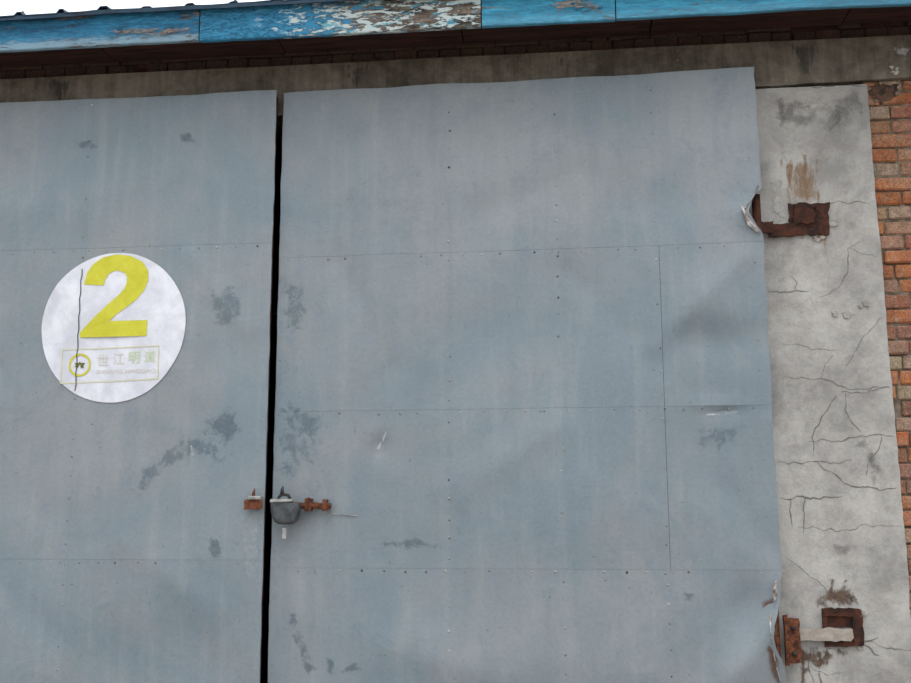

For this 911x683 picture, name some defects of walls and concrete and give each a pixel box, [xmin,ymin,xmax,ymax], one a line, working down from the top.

rust [781,155,820,201]
crack [782,387,895,532]
rust [768,625,779,680]